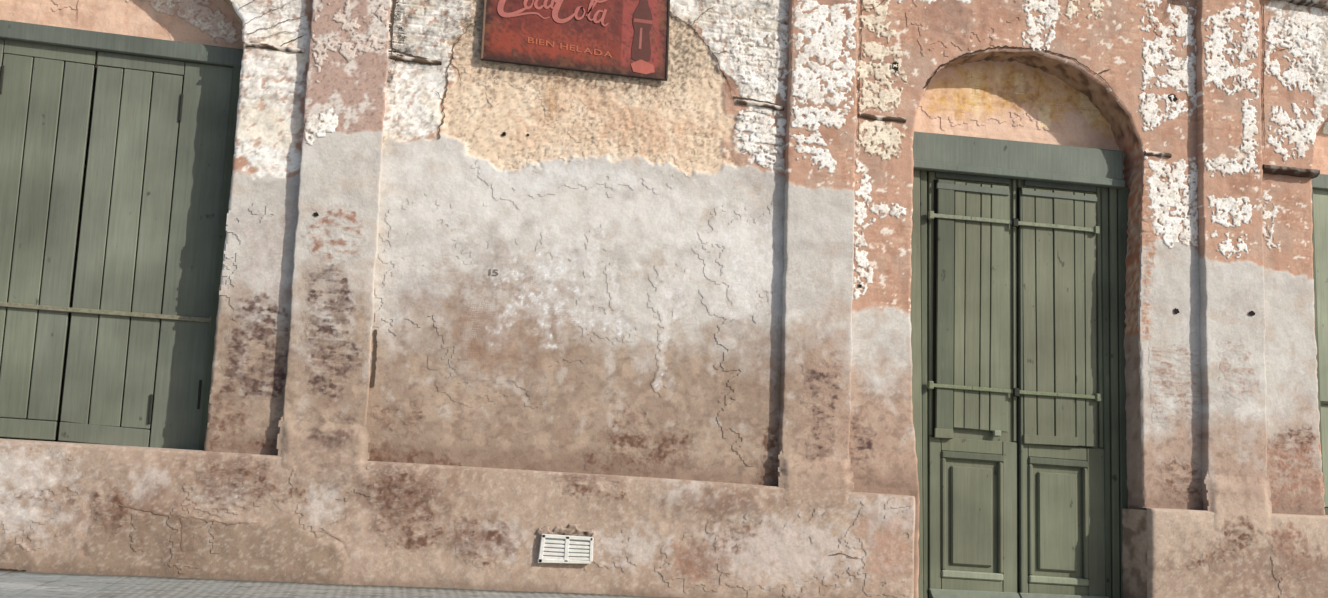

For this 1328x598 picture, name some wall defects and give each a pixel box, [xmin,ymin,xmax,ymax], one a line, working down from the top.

peeling [125,0,242,45]
peeling [312,0,388,83]
peeling [1021,0,1104,51]
peeling [304,107,339,146]
peeling [729,0,936,300]
peeling [1138,0,1328,424]